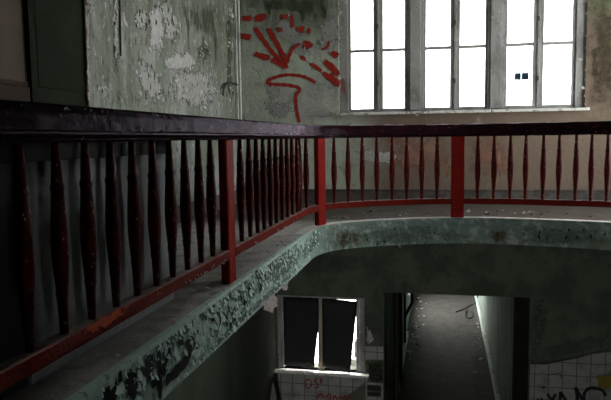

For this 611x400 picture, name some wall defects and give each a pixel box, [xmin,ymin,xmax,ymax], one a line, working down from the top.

peeling [134,0,218,110]
peeling [85,305,131,335]
peeling [101,230,321,400]